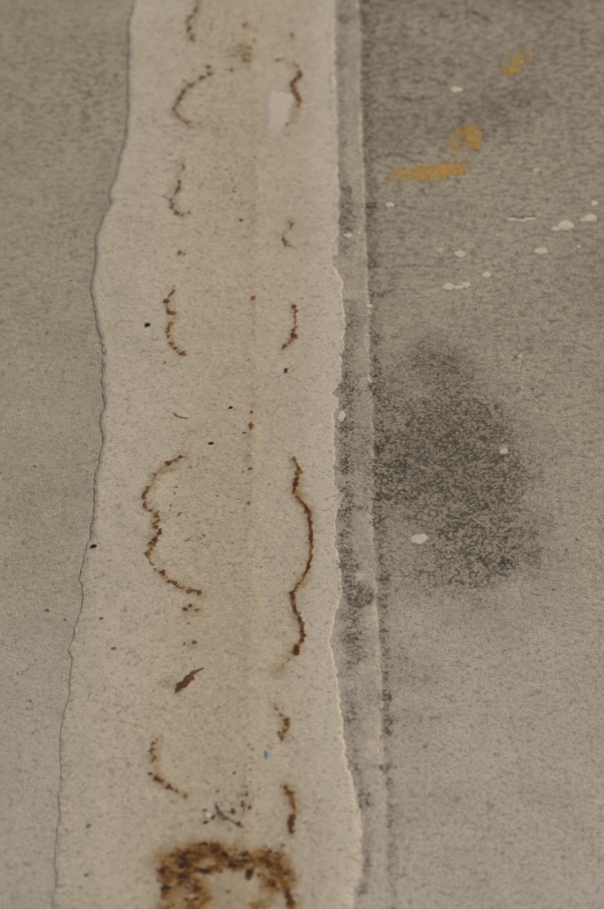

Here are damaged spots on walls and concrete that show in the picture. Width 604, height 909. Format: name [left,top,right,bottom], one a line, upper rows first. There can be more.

corrosion [290,63,303,106]
corrosion [163,285,186,356]
corrosion [282,298,302,349]
water stain [373,346,534,587]
corrosion [142,473,202,595]
corrosion [288,457,314,660]
water stain [338,315,393,734]
corrosion [175,668,204,693]
corrosion [148,772,187,798]
corrosion [203,793,252,830]
corrosion [284,785,297,833]
corrosion [156,841,299,909]